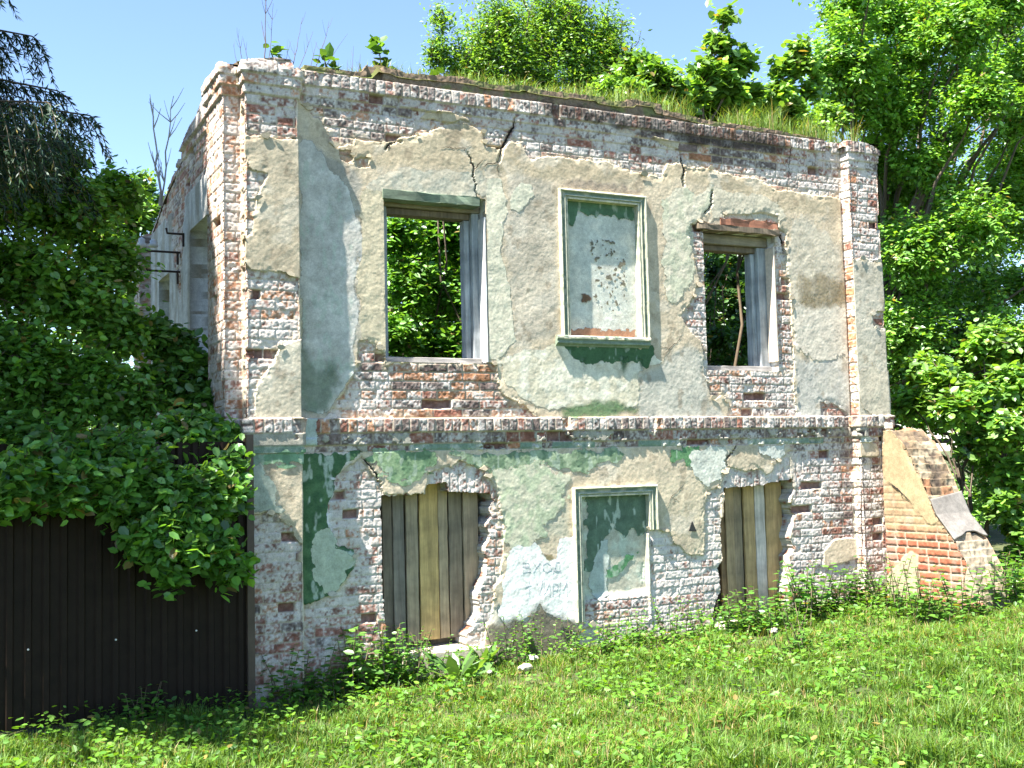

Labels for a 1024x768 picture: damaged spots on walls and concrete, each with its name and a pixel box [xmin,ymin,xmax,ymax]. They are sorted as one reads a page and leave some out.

crack [443,119,515,187]
spalling [237,57,881,418]
water stain [785,214,842,305]
spalling [254,446,624,709]
spalling [575,442,888,649]